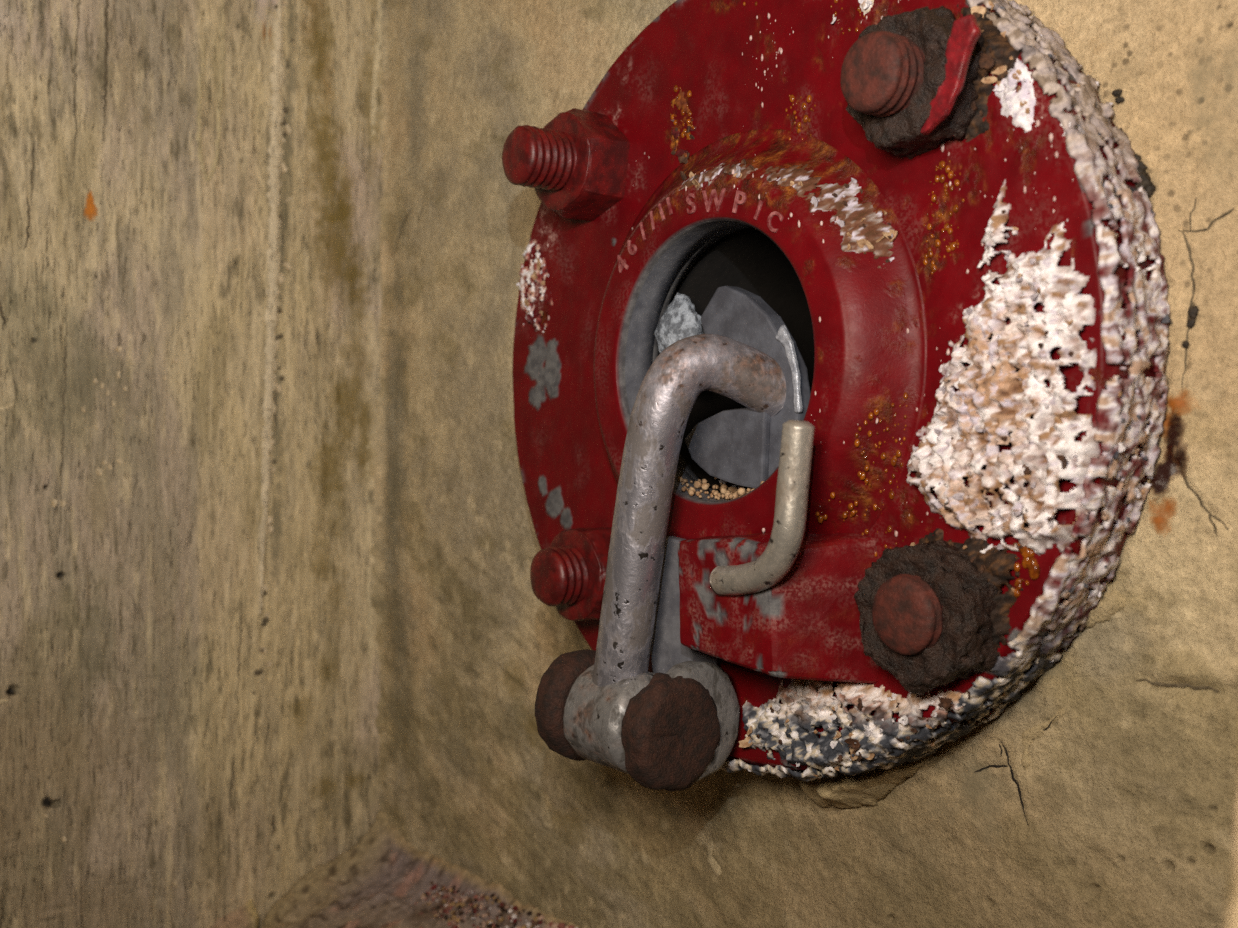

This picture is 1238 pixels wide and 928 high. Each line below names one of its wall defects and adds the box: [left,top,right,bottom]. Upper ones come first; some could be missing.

crack [1178,198,1234,395]
crack [1178,466,1229,536]